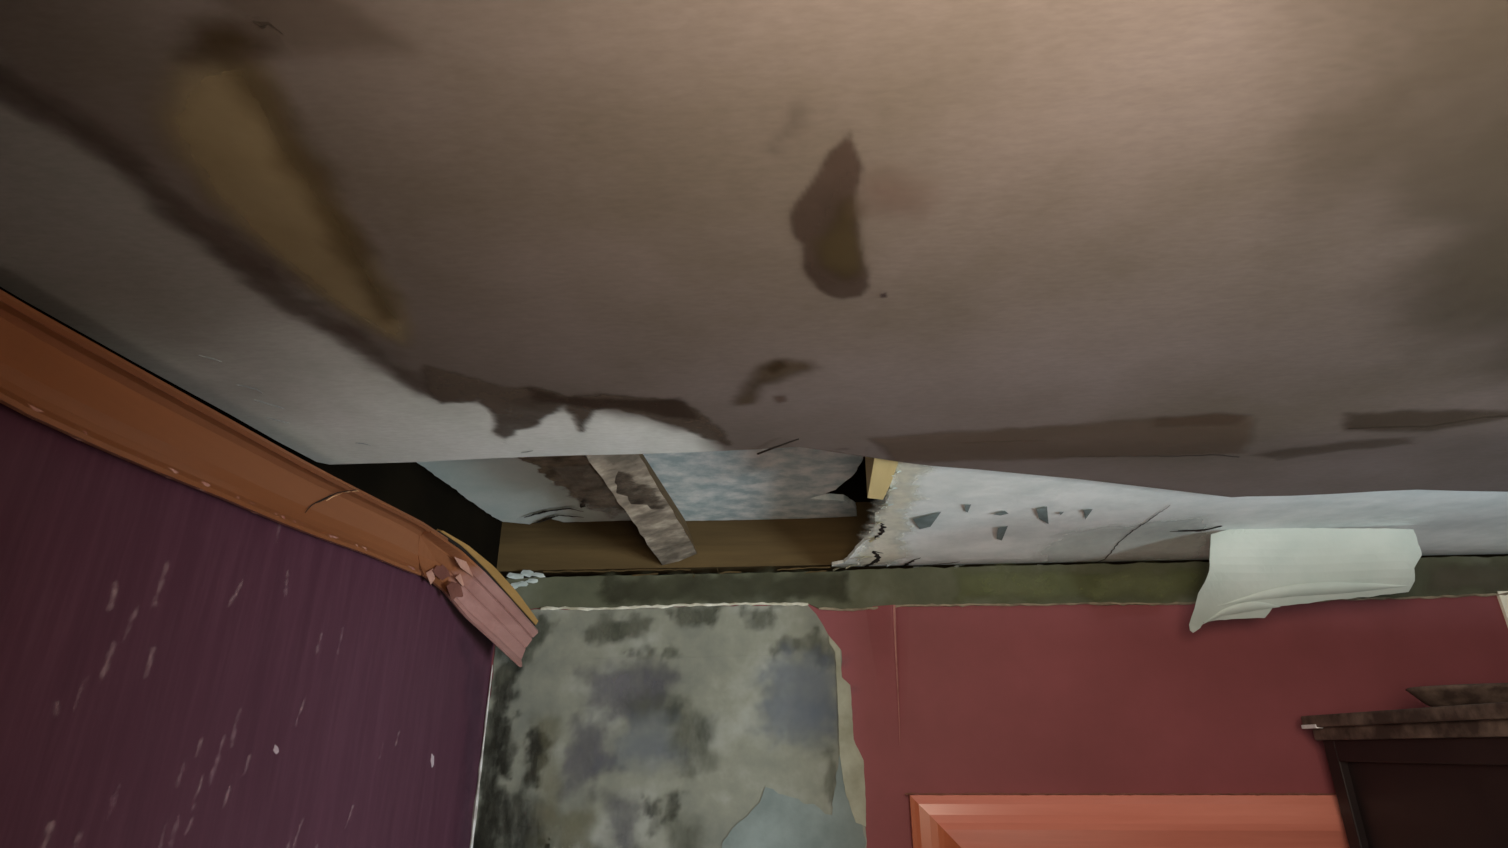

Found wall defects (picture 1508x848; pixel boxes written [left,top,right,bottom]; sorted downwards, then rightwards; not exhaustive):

water stain [0,33,731,445]
water stain [792,140,868,298]
water stain [875,415,1253,462]
water stain [1350,411,1508,430]
peeling [426,557,473,601]
water stain [602,572,848,603]
peeling [473,471,1508,848]